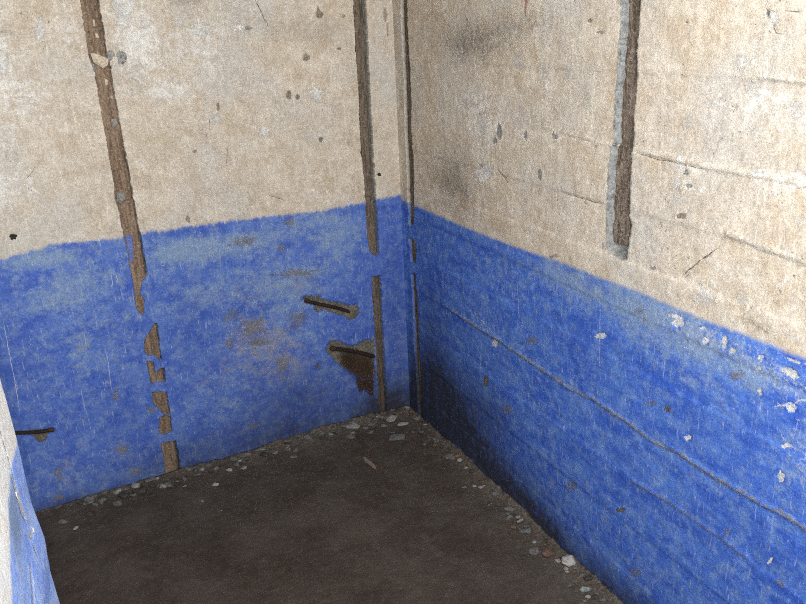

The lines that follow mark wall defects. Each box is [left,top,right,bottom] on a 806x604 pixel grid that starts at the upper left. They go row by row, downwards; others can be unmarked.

peeling [668,314,684,331]
rust [341,353,375,396]
peeling [781,357,806,380]